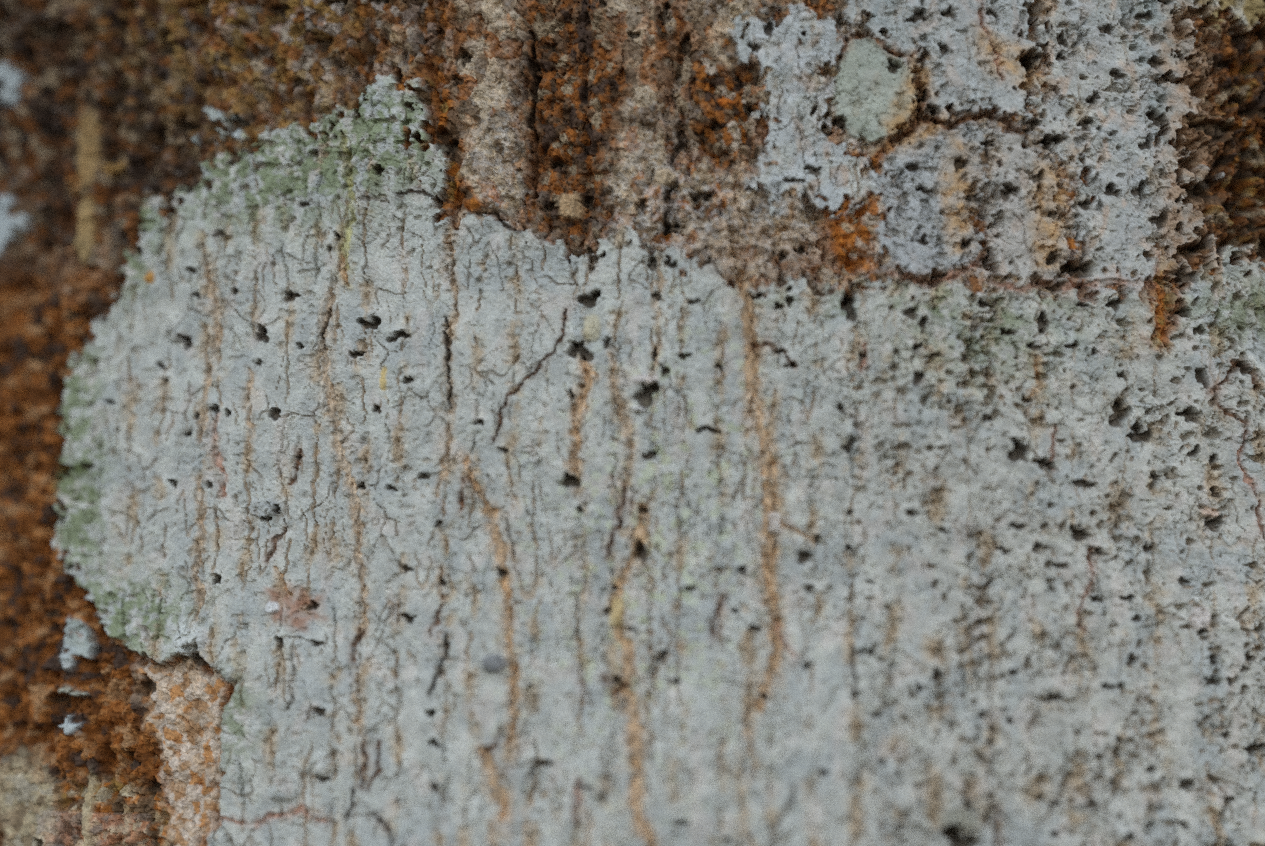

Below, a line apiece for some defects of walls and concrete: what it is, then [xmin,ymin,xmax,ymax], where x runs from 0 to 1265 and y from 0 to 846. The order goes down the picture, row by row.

spalling [748,17,775,55]
rust [519,0,634,251]
rust [685,54,763,176]
spalling [822,115,848,140]
rust [446,152,487,230]
rust [734,192,888,282]
spalling [650,347,693,381]
crack [219,129,543,846]
crack [565,119,691,846]
crack [709,147,814,846]
spalling [797,535,822,566]
crack [1210,360,1265,565]